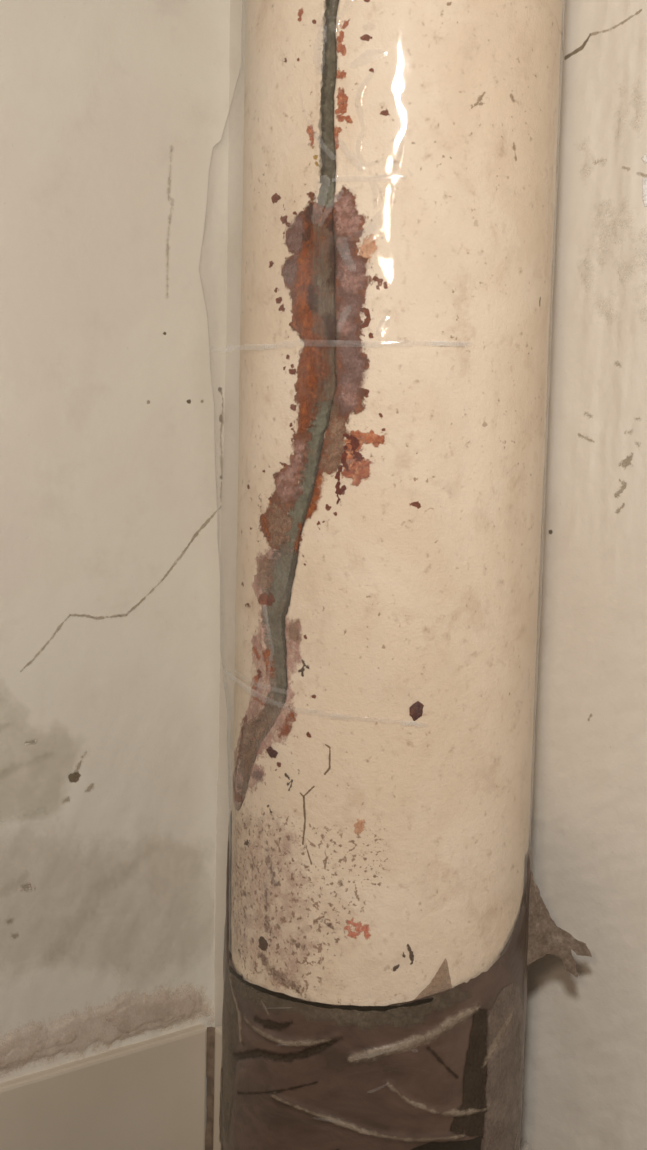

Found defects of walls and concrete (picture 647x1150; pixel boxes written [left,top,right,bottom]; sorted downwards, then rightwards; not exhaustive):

crack [565,9,642,60]
crack [24,387,223,668]
crack [235,0,339,811]
rust [232,187,388,807]
water stain [233,805,388,996]
crack [300,744,331,865]